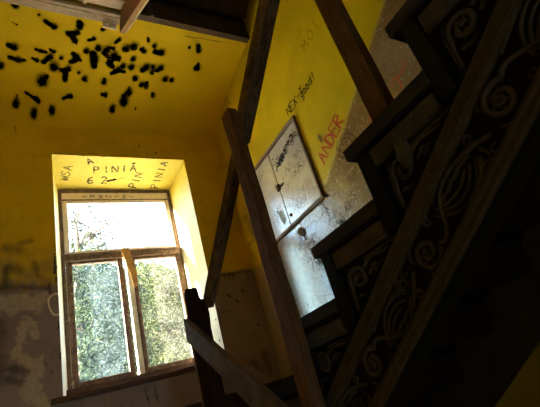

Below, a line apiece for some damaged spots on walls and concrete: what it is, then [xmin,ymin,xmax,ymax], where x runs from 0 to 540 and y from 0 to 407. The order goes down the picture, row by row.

peeling [297,203,325,236]
peeling [0,287,57,407]